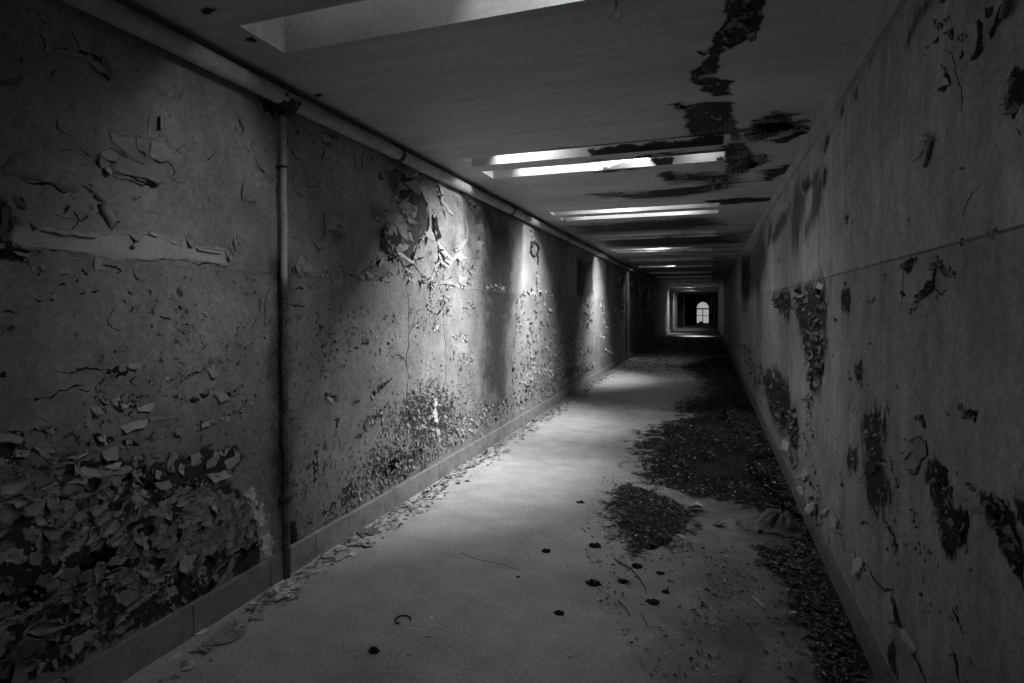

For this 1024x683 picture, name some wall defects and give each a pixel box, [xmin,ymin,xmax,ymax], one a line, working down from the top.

peeling [66,114,181,188]
peeling [1000,66,1024,119]
peeling [0,195,275,683]
peeling [289,152,658,545]
peeling [751,268,851,553]
peeling [899,255,956,319]
peeling [835,359,1024,590]